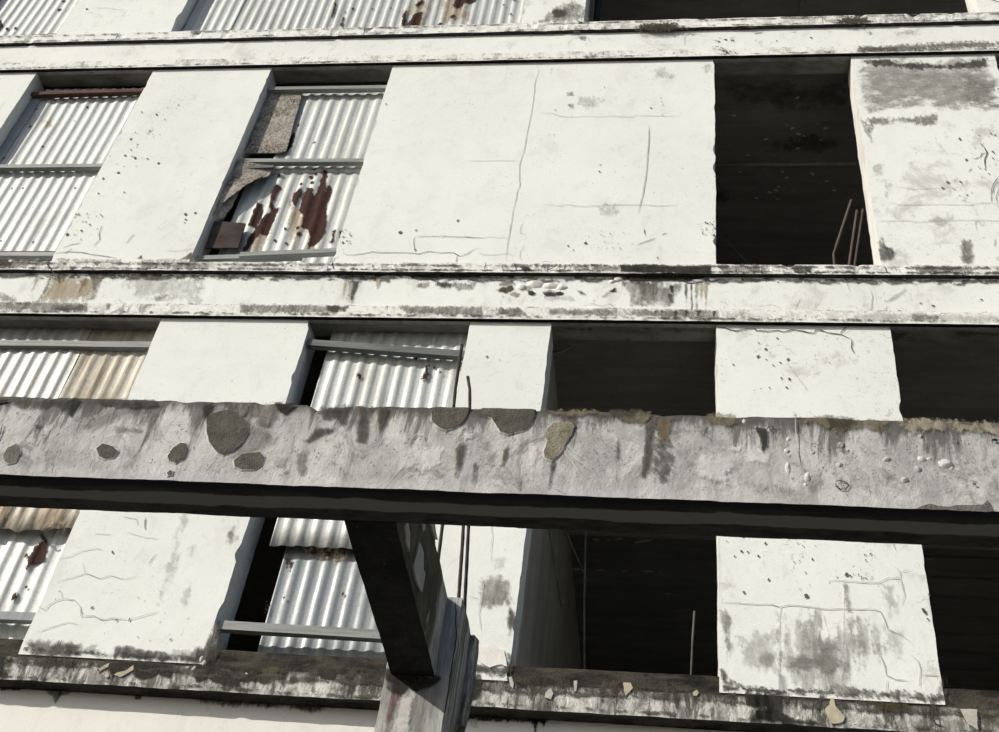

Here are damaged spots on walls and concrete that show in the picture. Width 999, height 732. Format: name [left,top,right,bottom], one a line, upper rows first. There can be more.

corrosion [401,0,429,26]
leakage [857,40,999,136]
crack [331,63,658,270]
corrosion [242,168,342,252]
leakage [0,237,999,331]
spalling [85,443,120,461]
spalling [165,442,190,478]
spalling [205,409,266,472]
leakage [297,404,388,475]
corrosion [24,508,66,571]
crack [38,533,157,632]
leakage [469,584,962,732]